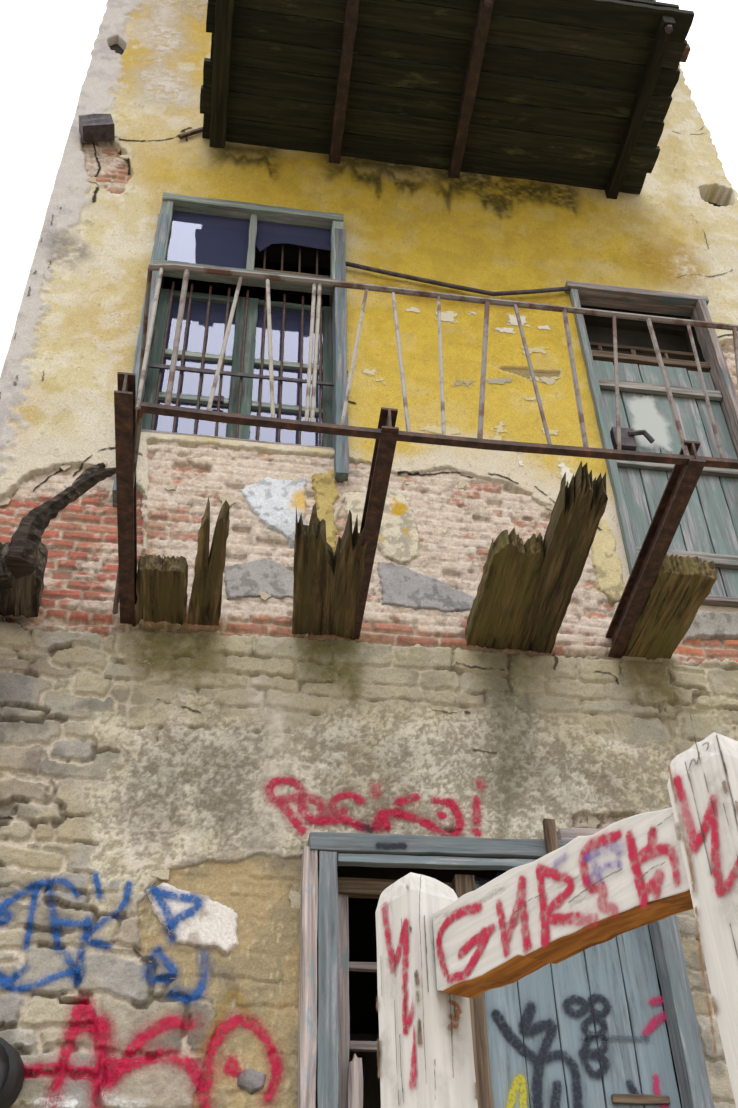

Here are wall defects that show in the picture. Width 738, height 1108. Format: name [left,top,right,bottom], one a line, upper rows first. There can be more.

flaking render [82,141,134,194]
water stain [334,157,416,192]
water stain [436,170,575,215]
peeling [436,311,477,323]
peeling [495,314,551,334]
flaking render [455,368,560,386]
flaking render [721,343,738,396]
peeling [419,424,461,436]
peeling [490,421,507,440]
crack [33,447,143,492]
flaking render [0,442,625,660]
flaking render [673,611,738,667]